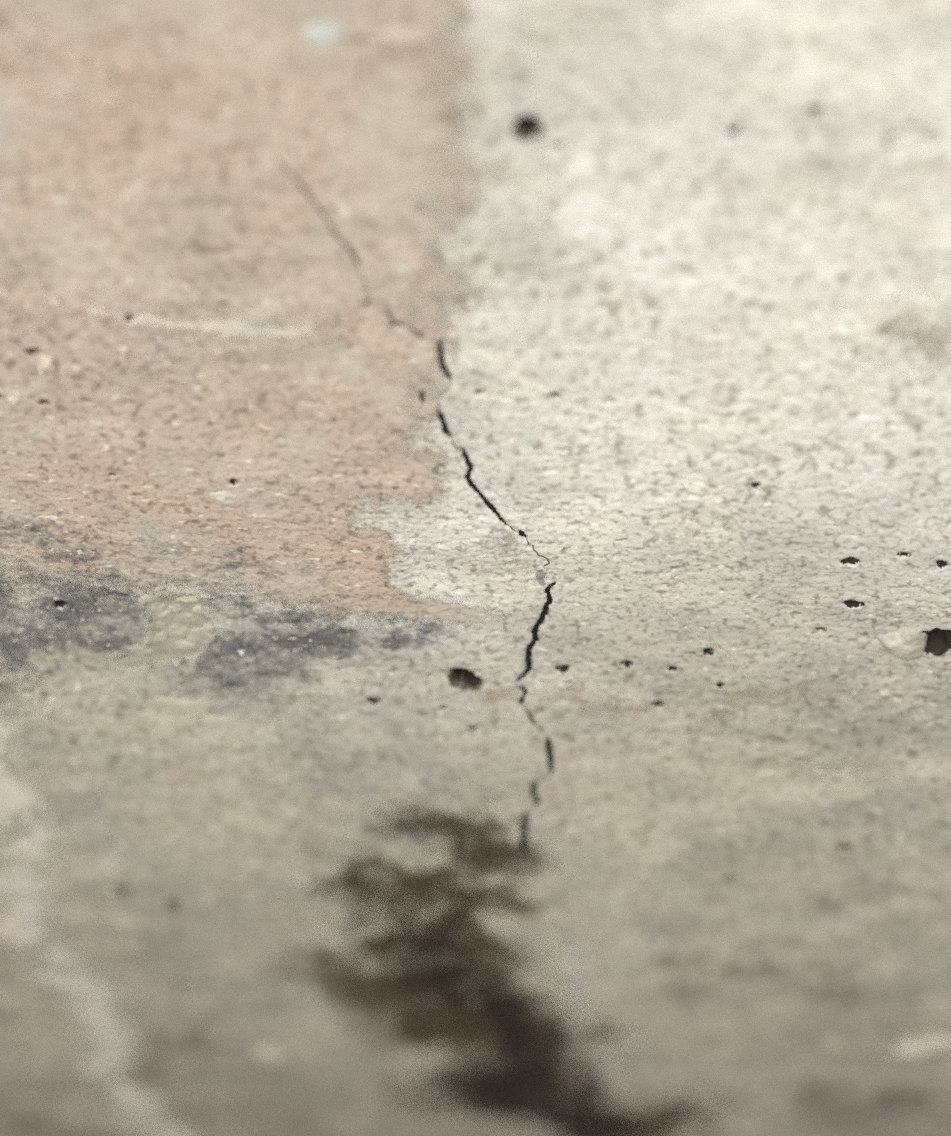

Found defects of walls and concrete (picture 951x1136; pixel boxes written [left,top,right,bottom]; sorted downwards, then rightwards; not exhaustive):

crack [275,157,556,851]
water stain [314,806,714,1136]